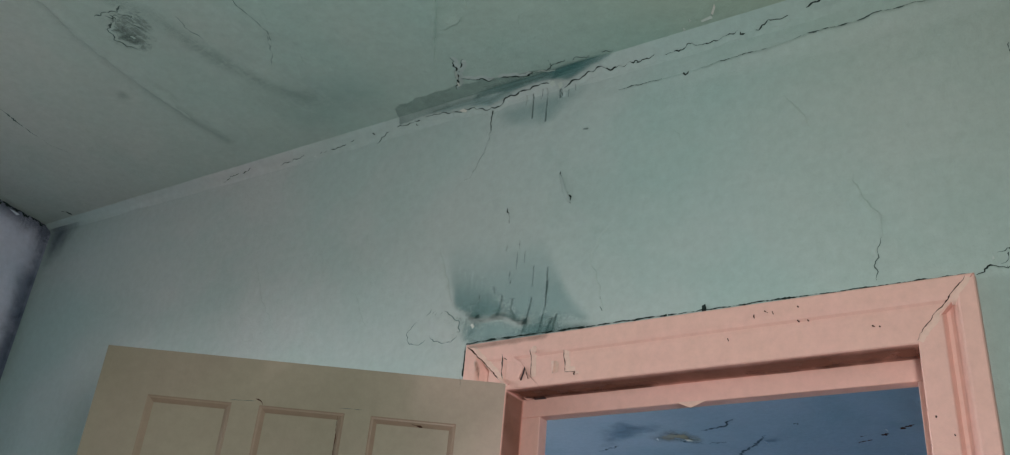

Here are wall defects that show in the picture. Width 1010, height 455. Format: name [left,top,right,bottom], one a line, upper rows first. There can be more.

peeling [497,346,547,401]
crack [462,236,1010,382]